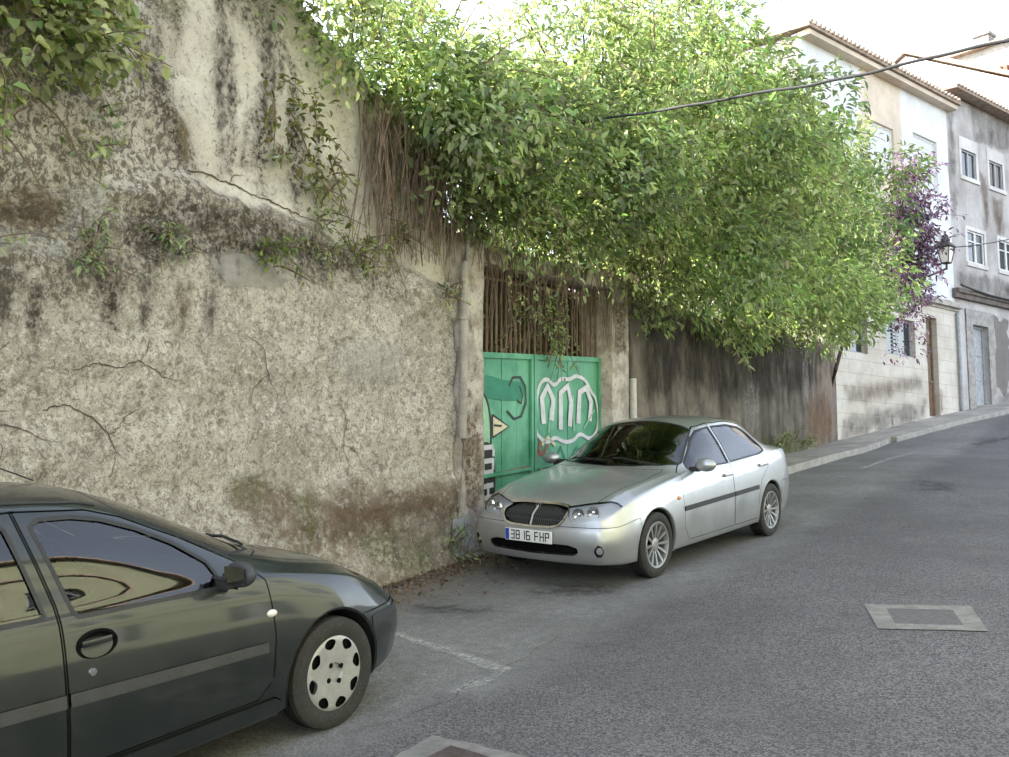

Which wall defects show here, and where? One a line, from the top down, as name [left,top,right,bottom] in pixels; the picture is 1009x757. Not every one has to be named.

water stain [215,0,299,168]
crack [187,170,333,231]
water stain [94,261,122,334]
crack [73,338,182,382]
crack [248,336,279,413]
peeling [993,315,1009,397]
crack [0,410,59,466]
crack [43,404,143,480]